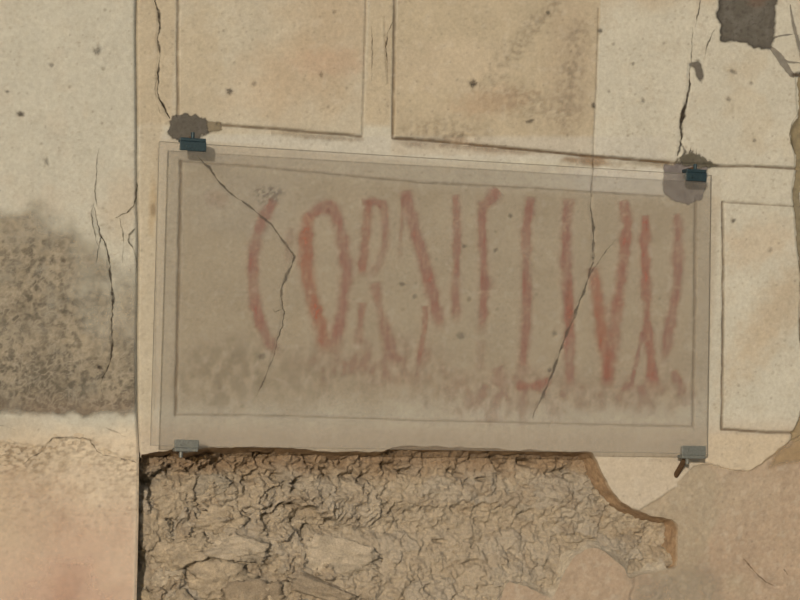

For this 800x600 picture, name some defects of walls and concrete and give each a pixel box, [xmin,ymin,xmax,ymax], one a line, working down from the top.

crack [154,0,170,119]
crack [677,73,691,156]
crack [770,4,800,269]
crack [91,150,138,382]
crack [199,158,295,389]
crack [533,202,606,416]
spalling [102,445,679,600]
crack [790,416,800,442]